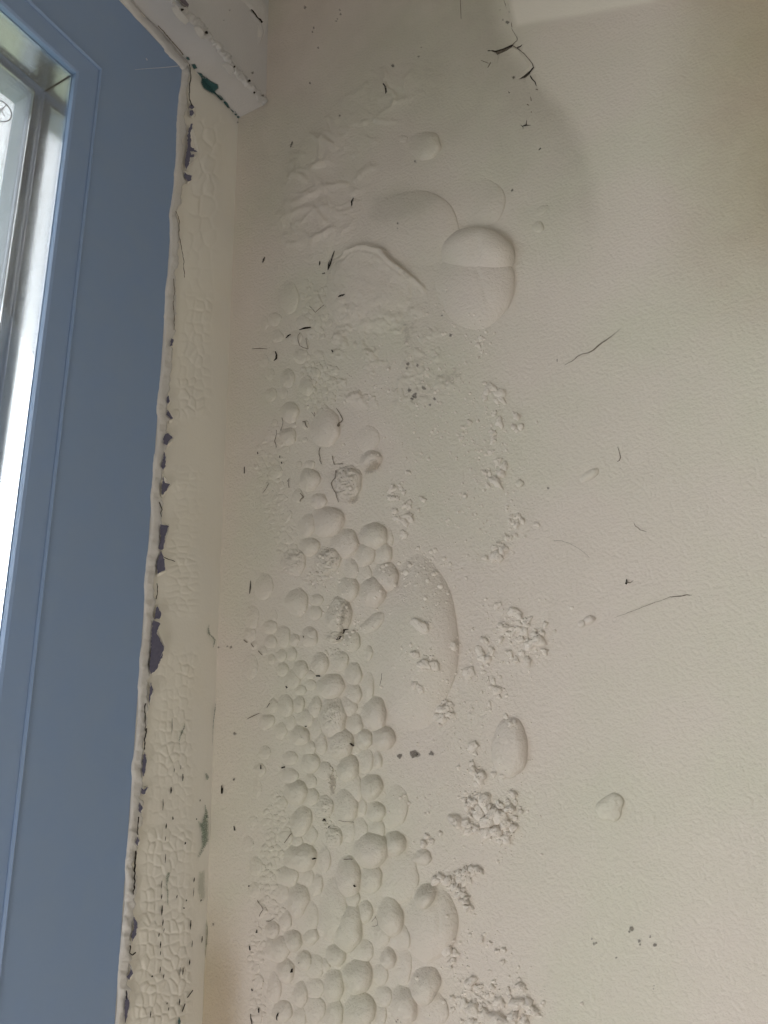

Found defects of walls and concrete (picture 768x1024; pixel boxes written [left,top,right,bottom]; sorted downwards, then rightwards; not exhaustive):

crack [158,26,192,106]
crack [481,30,538,127]
crack [173,211,185,327]
peeling [160,396,174,497]
peeling [156,522,170,577]
peeling [148,605,166,707]
crack [141,703,149,750]
crack [132,817,140,894]